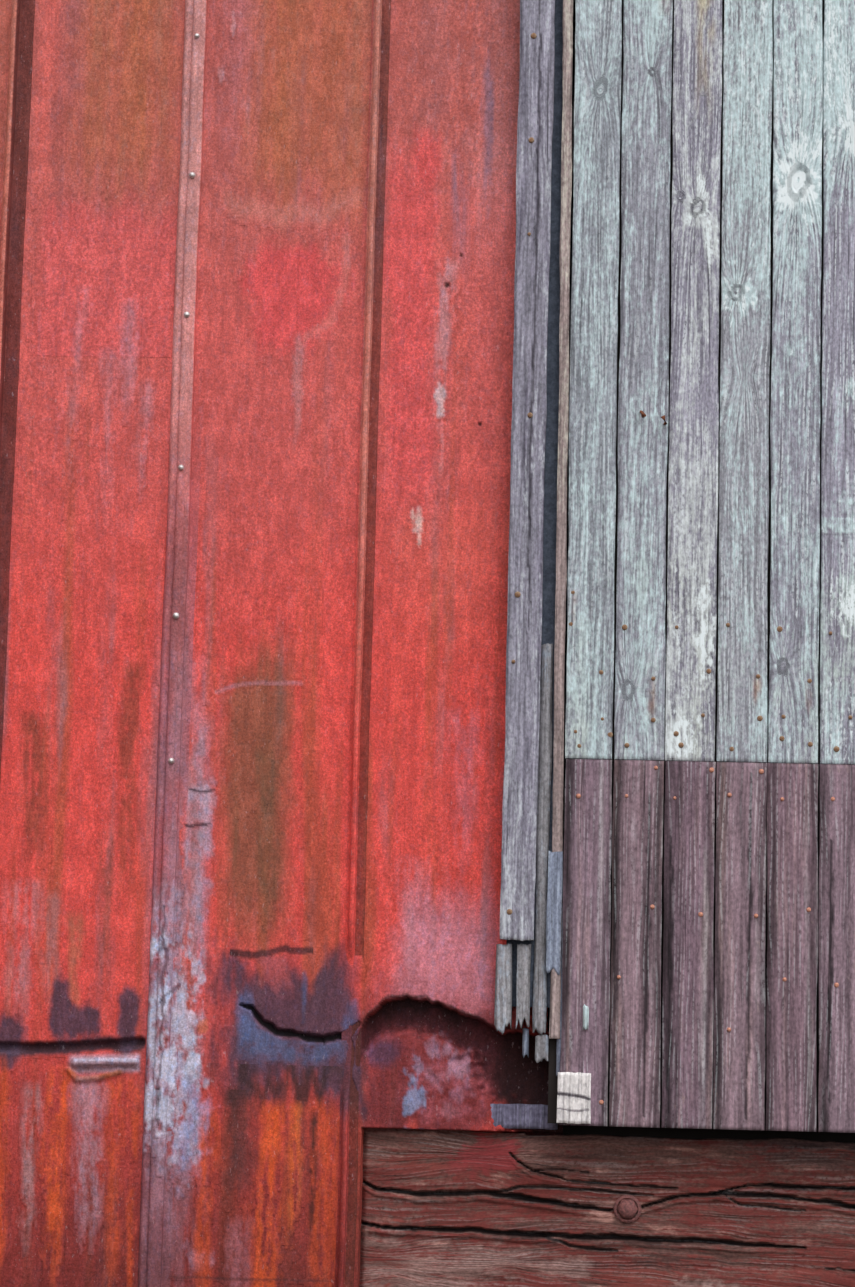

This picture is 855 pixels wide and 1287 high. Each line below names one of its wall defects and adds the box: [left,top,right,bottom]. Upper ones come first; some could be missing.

peeling [142,685,366,1200]
peeling [395,1028,525,1181]
crack [361,1152,855,1272]